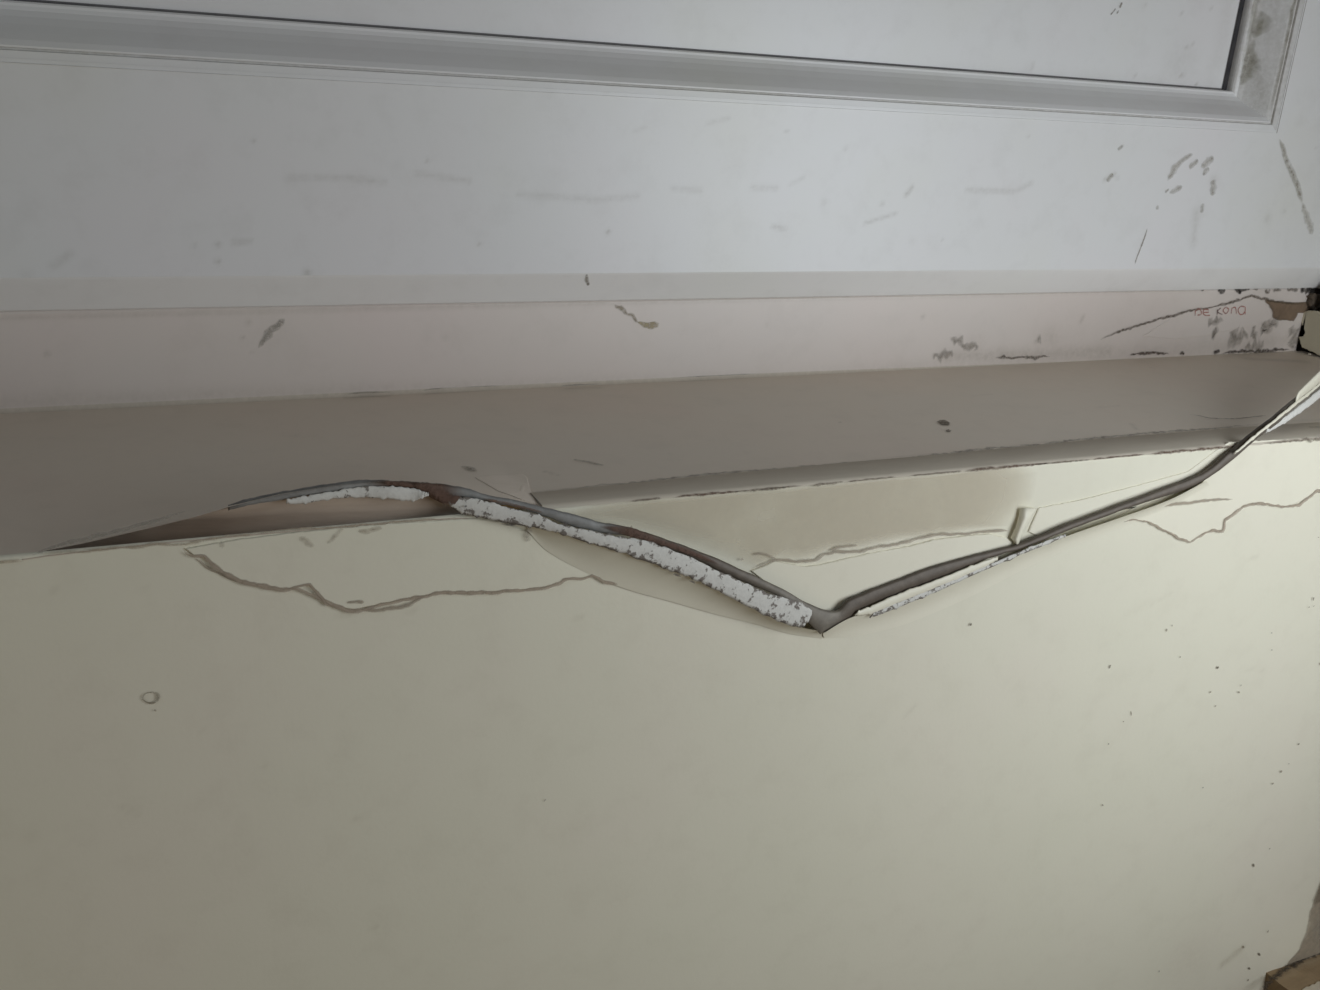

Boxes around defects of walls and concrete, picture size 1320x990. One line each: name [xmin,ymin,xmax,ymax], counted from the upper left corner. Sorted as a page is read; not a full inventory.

peeling [0,486,590,609]
crack [186,553,615,613]
peeling [751,533,1014,621]
flaking render [531,422,1320,542]
crack [1125,489,1320,543]